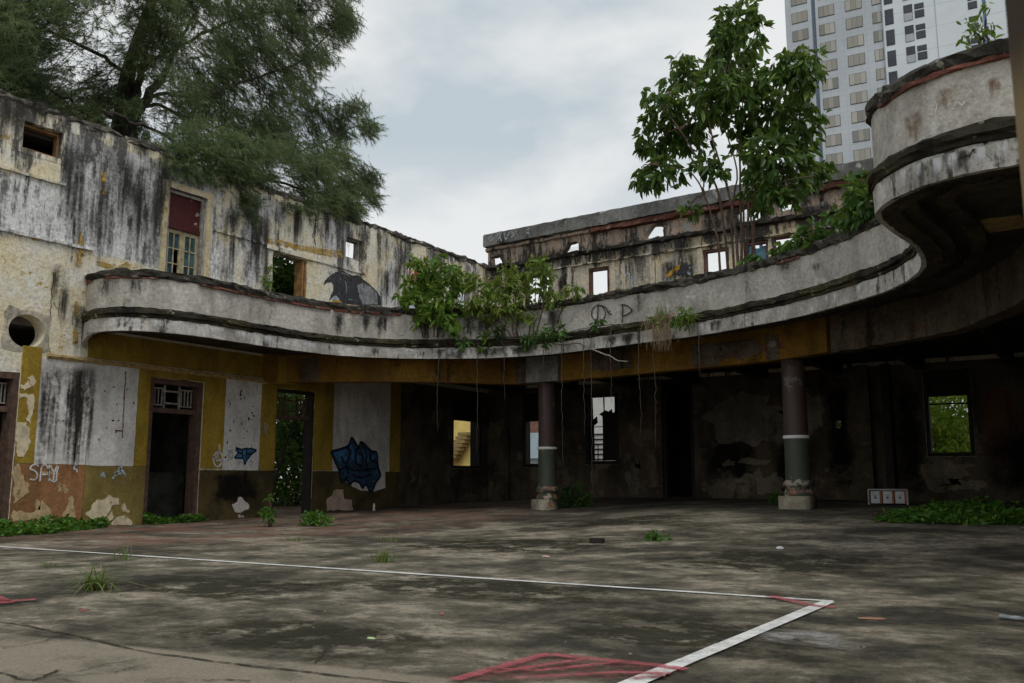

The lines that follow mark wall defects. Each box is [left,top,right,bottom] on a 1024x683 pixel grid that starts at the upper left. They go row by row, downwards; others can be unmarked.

damp [63,149,170,255]
damp [225,215,269,284]
damp [283,209,302,238]
damp [379,232,411,291]
damp [663,237,694,281]
damp [40,371,95,455]
peeling [11,375,133,525]
peeling [702,390,785,498]
peeling [232,497,249,518]
peeling [326,489,353,511]